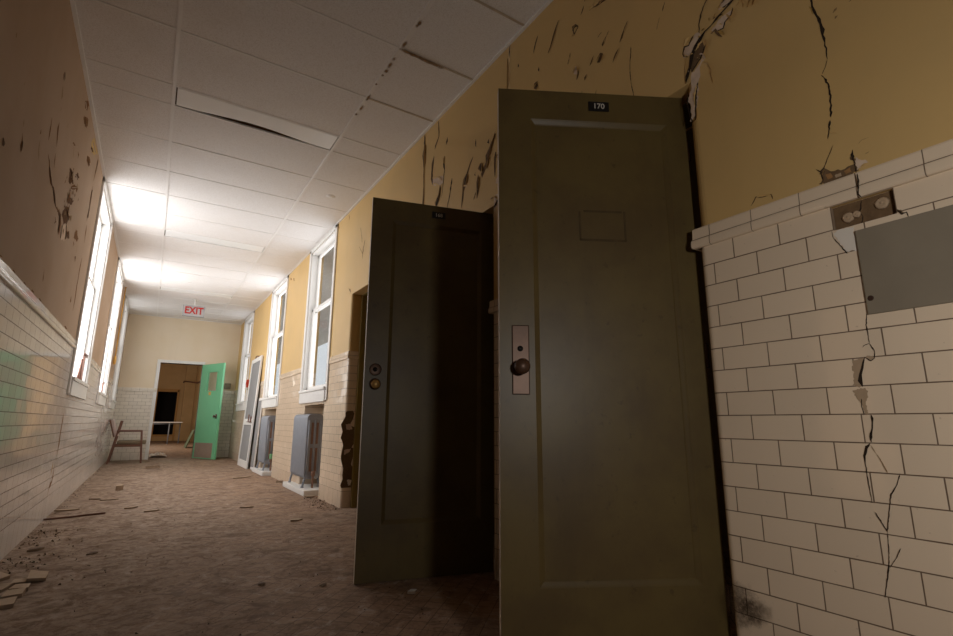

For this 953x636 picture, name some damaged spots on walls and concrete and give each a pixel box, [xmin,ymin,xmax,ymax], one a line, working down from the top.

peeling [682,0,755,122]
crack [809,0,837,137]
peeling [48,137,98,308]
peeling [422,121,443,206]
peeling [461,133,498,209]
spalling [340,411,354,488]
crack [852,315,901,597]